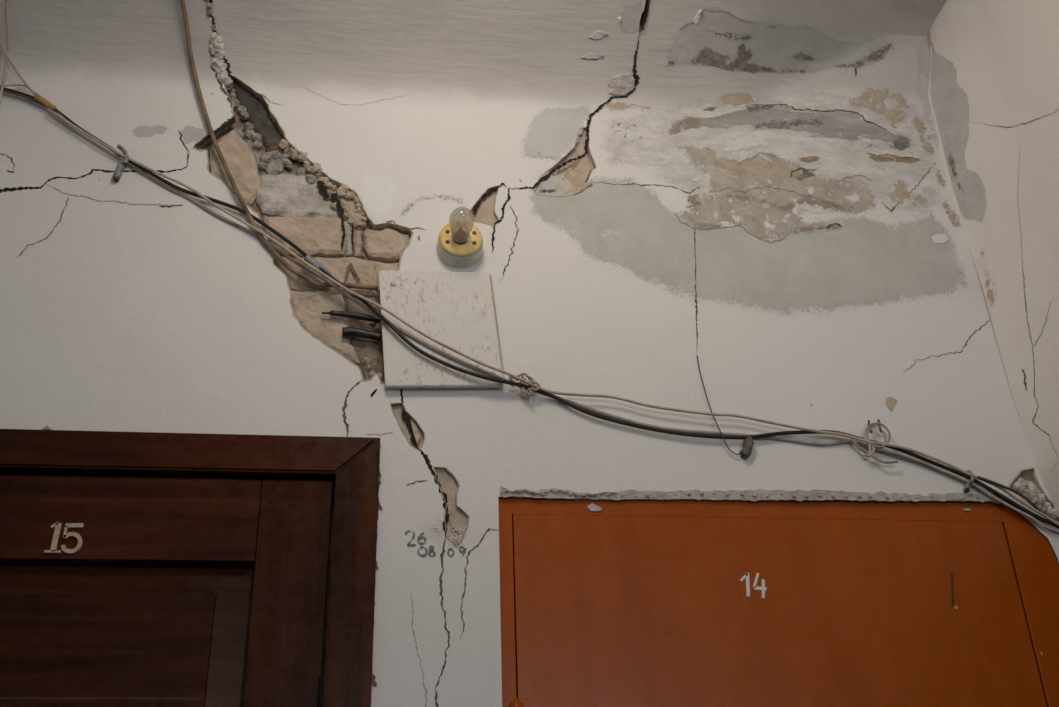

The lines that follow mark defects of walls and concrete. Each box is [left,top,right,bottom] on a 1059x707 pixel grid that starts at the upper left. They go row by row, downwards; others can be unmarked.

flaking render [665,8,894,76]
crack [0,0,236,256]
spalling [194,74,413,384]
spalling [532,127,597,197]
crack [491,0,652,277]
crack [591,182,704,194]
flaking render [668,103,912,243]
crack [982,109,1059,472]
crack [342,380,404,437]
spalling [390,402,425,451]
crack [406,447,496,707]
spalling [433,466,470,548]